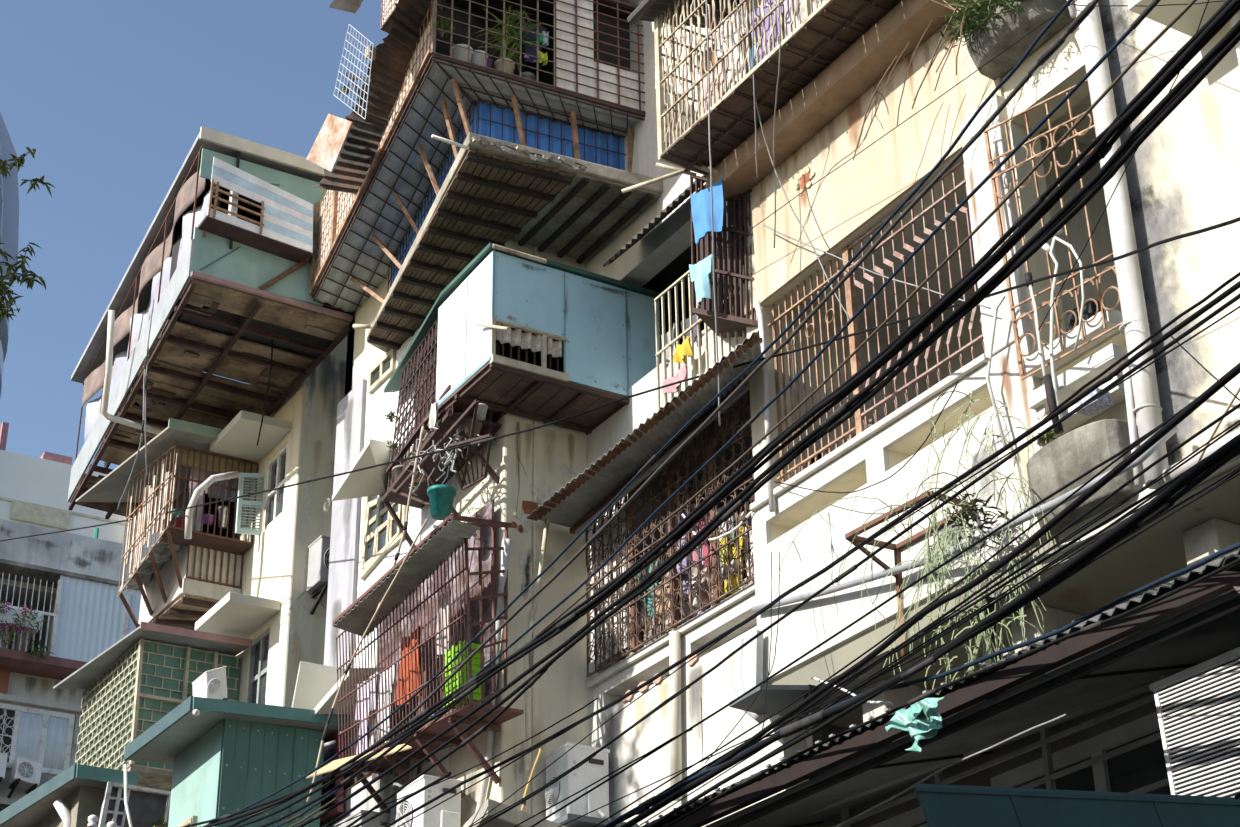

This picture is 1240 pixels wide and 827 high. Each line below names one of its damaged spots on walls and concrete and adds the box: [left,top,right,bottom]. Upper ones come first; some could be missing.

water stain [1098,0,1136,116]
water stain [1120,117,1139,144]
water stain [1124,136,1199,465]